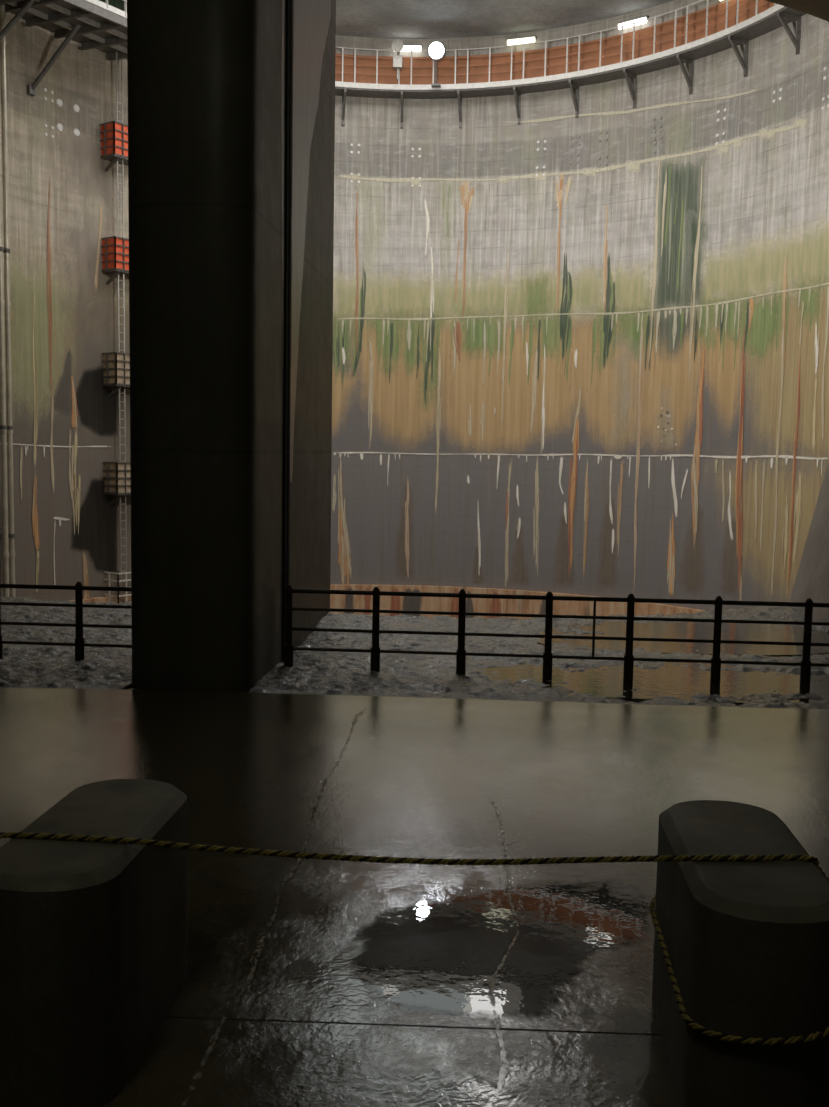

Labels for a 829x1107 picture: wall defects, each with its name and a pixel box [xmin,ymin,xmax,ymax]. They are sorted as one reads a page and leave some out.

damp [55,132,121,204]
corrosion [33,181,54,490]
damp [13,224,118,500]
corrosion [69,376,81,534]
damp [54,479,117,573]
corrosion [332,458,371,615]
corrosion [568,389,589,575]
damp [332,120,829,594]
corrosion [667,347,705,595]
corrosion [723,298,754,601]
crack [183,710,363,1106]